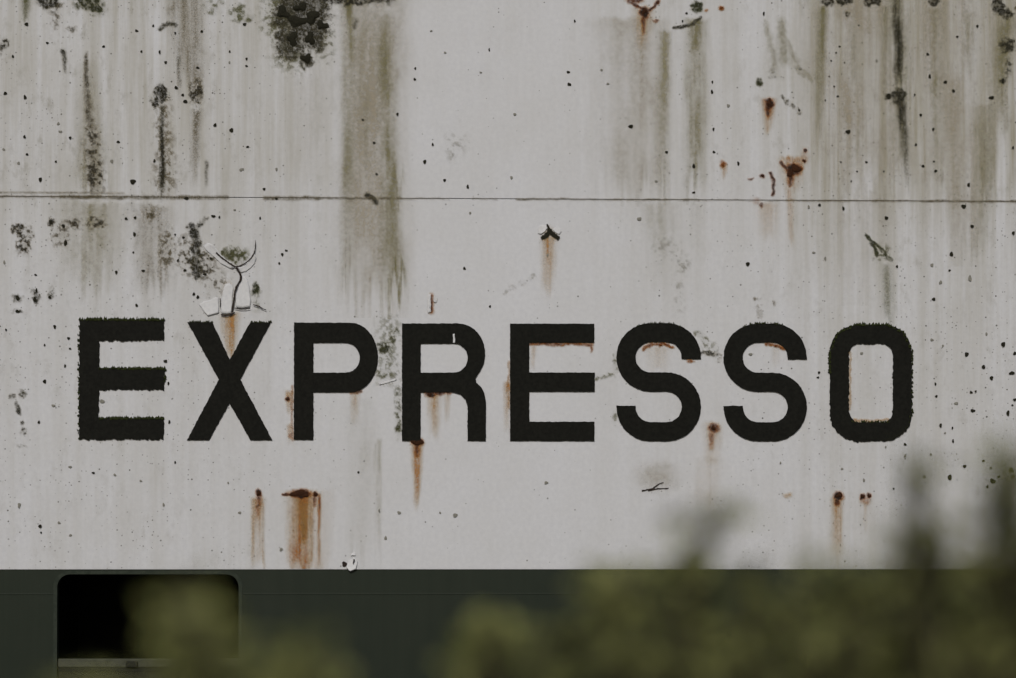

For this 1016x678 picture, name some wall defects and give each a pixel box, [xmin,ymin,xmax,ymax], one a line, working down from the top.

rust [627,0,660,33]
water stain [818,6,860,138]
water stain [878,0,917,151]
water stain [343,0,405,303]
rust [749,149,807,196]
rust [282,489,321,569]
rust [410,439,424,493]
rust [834,491,844,519]